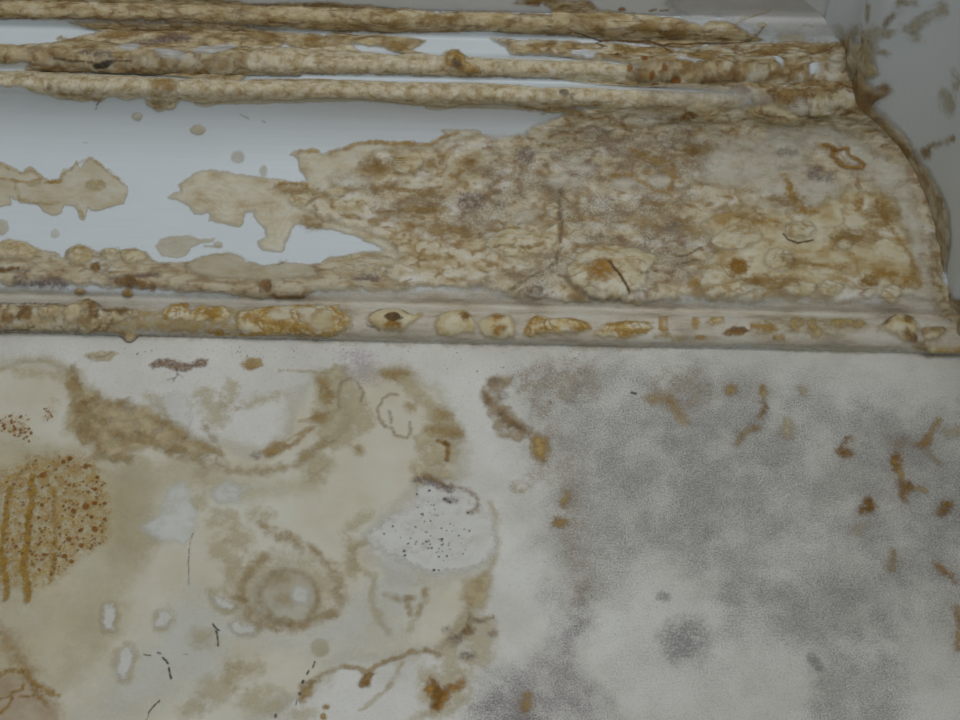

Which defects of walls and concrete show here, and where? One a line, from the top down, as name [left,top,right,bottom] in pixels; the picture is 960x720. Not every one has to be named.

peeling [0,0,960,356]
corrosion [0,456,107,602]
damp [0,353,492,720]
damp [482,366,595,462]
corrosion [891,455,928,499]
damp [470,618,593,720]